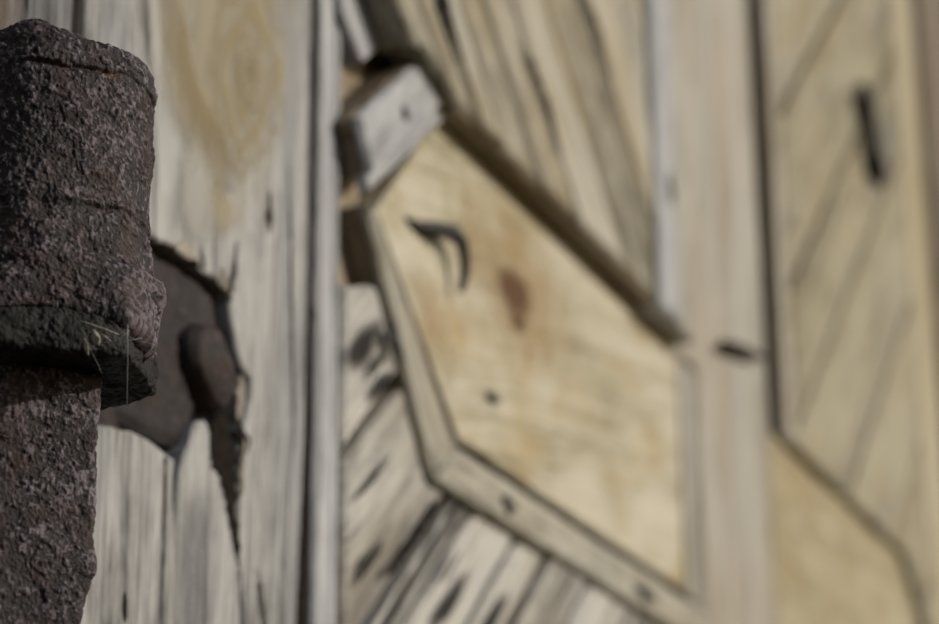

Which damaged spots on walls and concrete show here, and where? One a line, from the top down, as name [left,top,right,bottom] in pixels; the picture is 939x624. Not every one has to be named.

peeling [152,237,202,267]
peeling [199,267,233,302]
peeling [208,373,247,498]